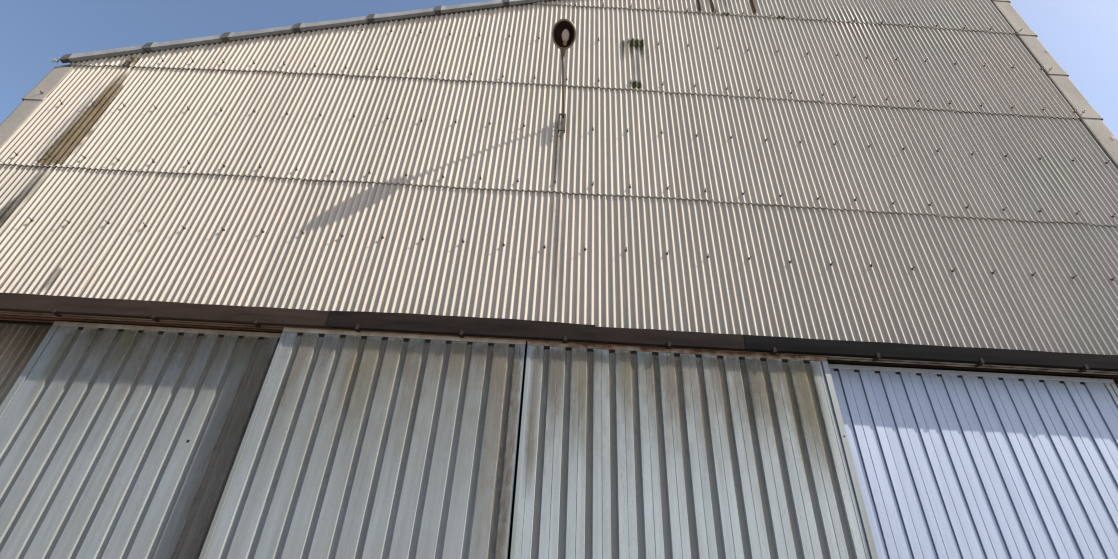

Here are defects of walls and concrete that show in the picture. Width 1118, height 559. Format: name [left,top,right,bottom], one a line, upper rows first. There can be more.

leakage [0,57,139,225]
leakage [171,338,279,559]
leakage [493,346,541,559]